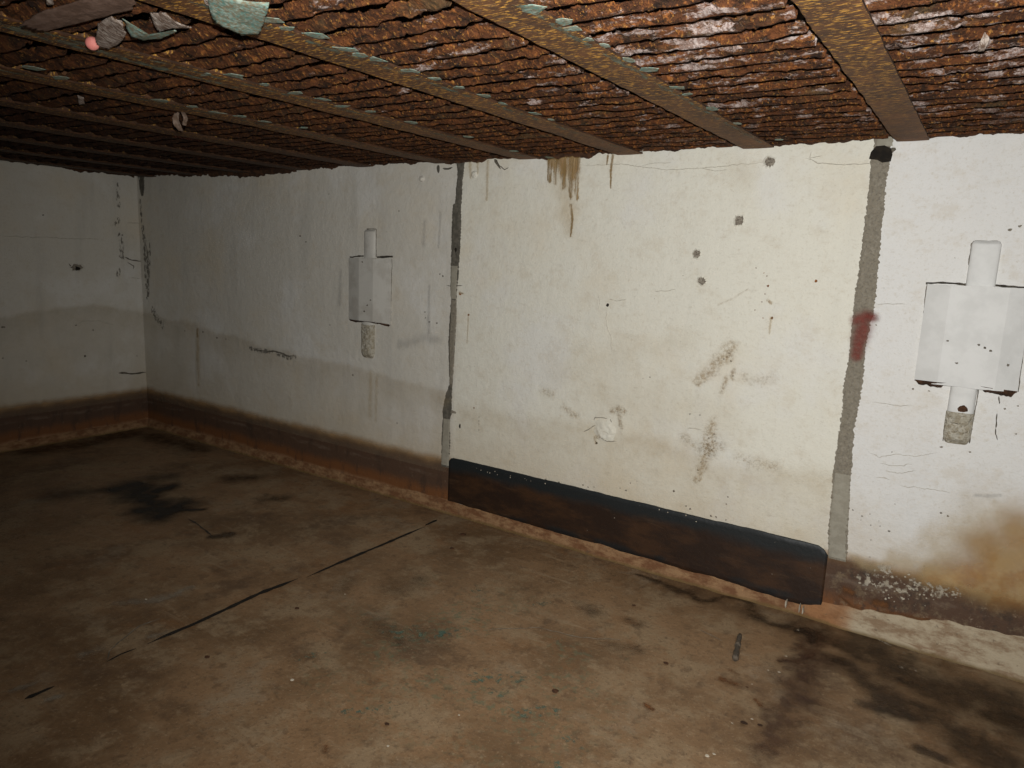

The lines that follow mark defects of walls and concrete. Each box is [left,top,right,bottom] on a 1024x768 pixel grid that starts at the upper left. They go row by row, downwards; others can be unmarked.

peeling [0,12,389,129]
rust [52,163,347,178]
rust [445,153,511,165]
rust [532,148,614,237]
rust [636,140,737,152]
rust [765,134,871,147]
rust [927,129,1024,139]
damp [0,388,459,504]
crack [107,519,437,662]
damp [822,554,1024,637]
crack [25,686,54,699]
damp [636,574,1024,768]